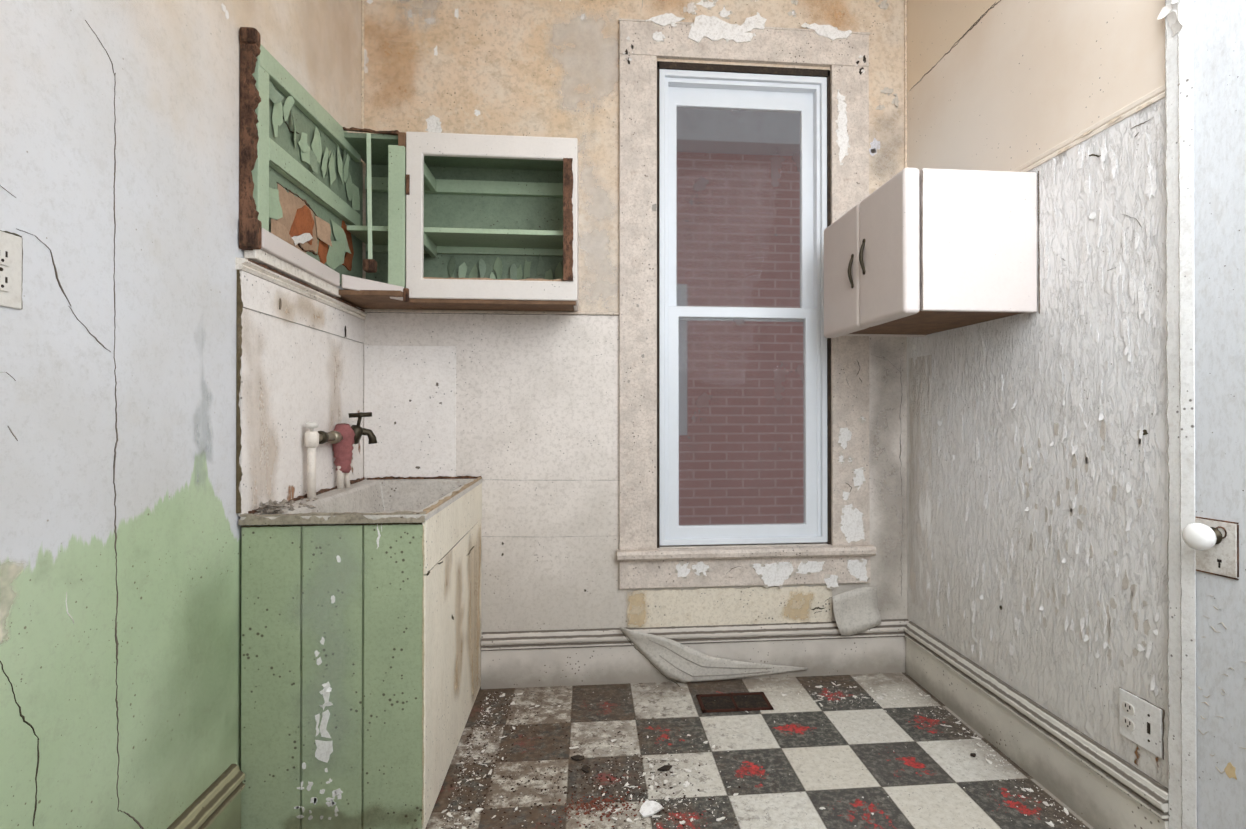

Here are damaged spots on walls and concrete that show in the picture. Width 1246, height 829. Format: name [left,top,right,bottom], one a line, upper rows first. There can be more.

damp [554,19,619,106]
peeling [646,0,767,43]
peeling [787,0,852,41]
crack [910,0,1001,90]
peeling [276,183,329,264]
peeling [341,220,354,271]
crack [18,20,144,829]
peeling [837,415,867,543]
peeling [926,337,1160,667]
peeling [749,558,870,614]
crack [0,661,39,826]
peeling [294,681,343,820]